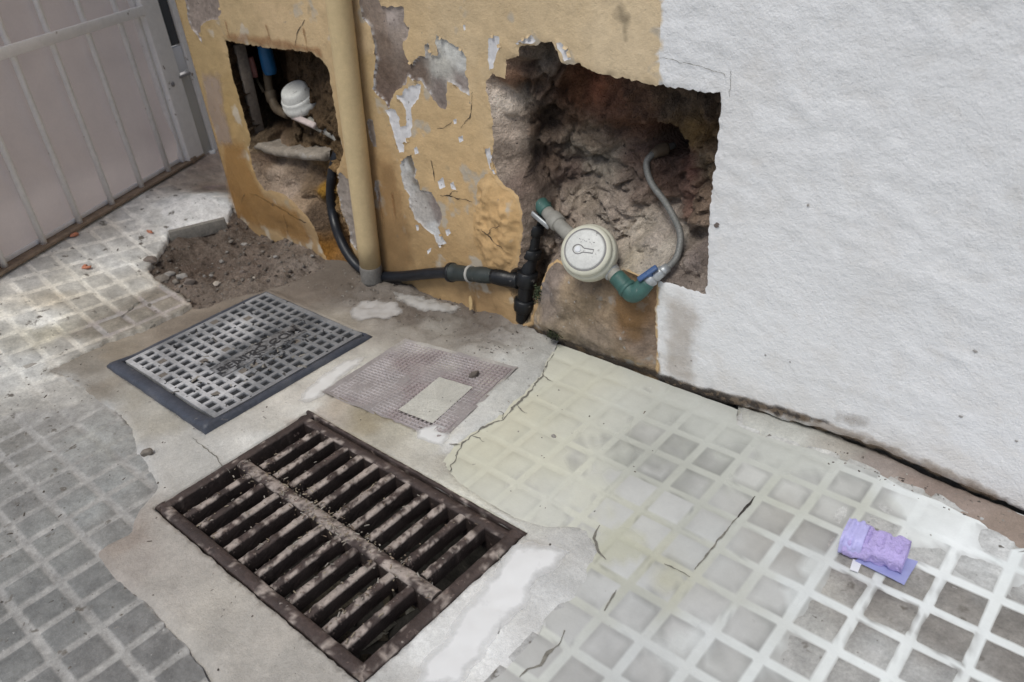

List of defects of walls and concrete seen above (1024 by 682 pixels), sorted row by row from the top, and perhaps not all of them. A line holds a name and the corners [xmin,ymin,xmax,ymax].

spalling [226,40,357,262]
peeling [359,0,470,254]
spalling [483,34,721,371]
crack [449,353,554,472]
spalling [252,531,309,573]
spalling [362,502,409,539]
spalling [379,512,427,550]
spalling [417,534,464,576]
spalling [435,545,488,591]
crack [665,496,755,577]
spalling [336,592,397,641]
spalling [355,608,421,660]